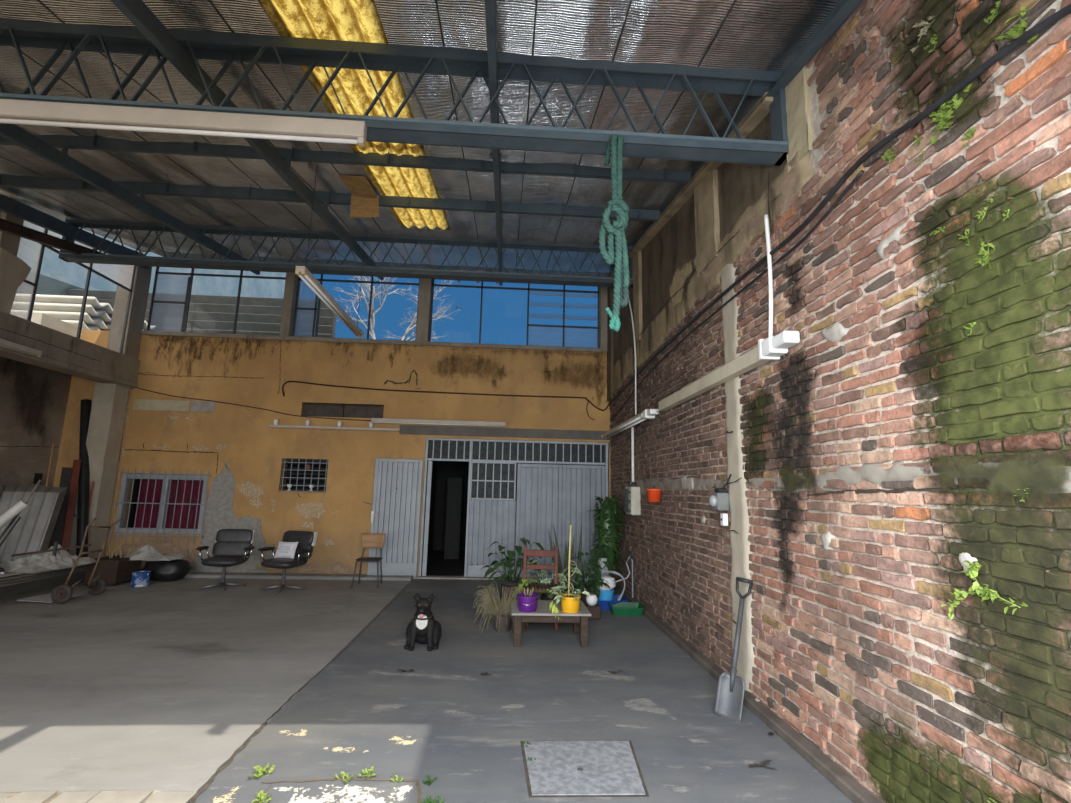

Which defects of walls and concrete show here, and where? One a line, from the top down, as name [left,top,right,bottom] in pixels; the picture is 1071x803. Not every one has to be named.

damp [917,203,965,261]
damp [897,297,957,388]
damp [740,386,776,481]
peeling [189,444,276,573]
damp [779,468,817,493]
damp [933,450,1071,502]
peeling [273,784,414,803]